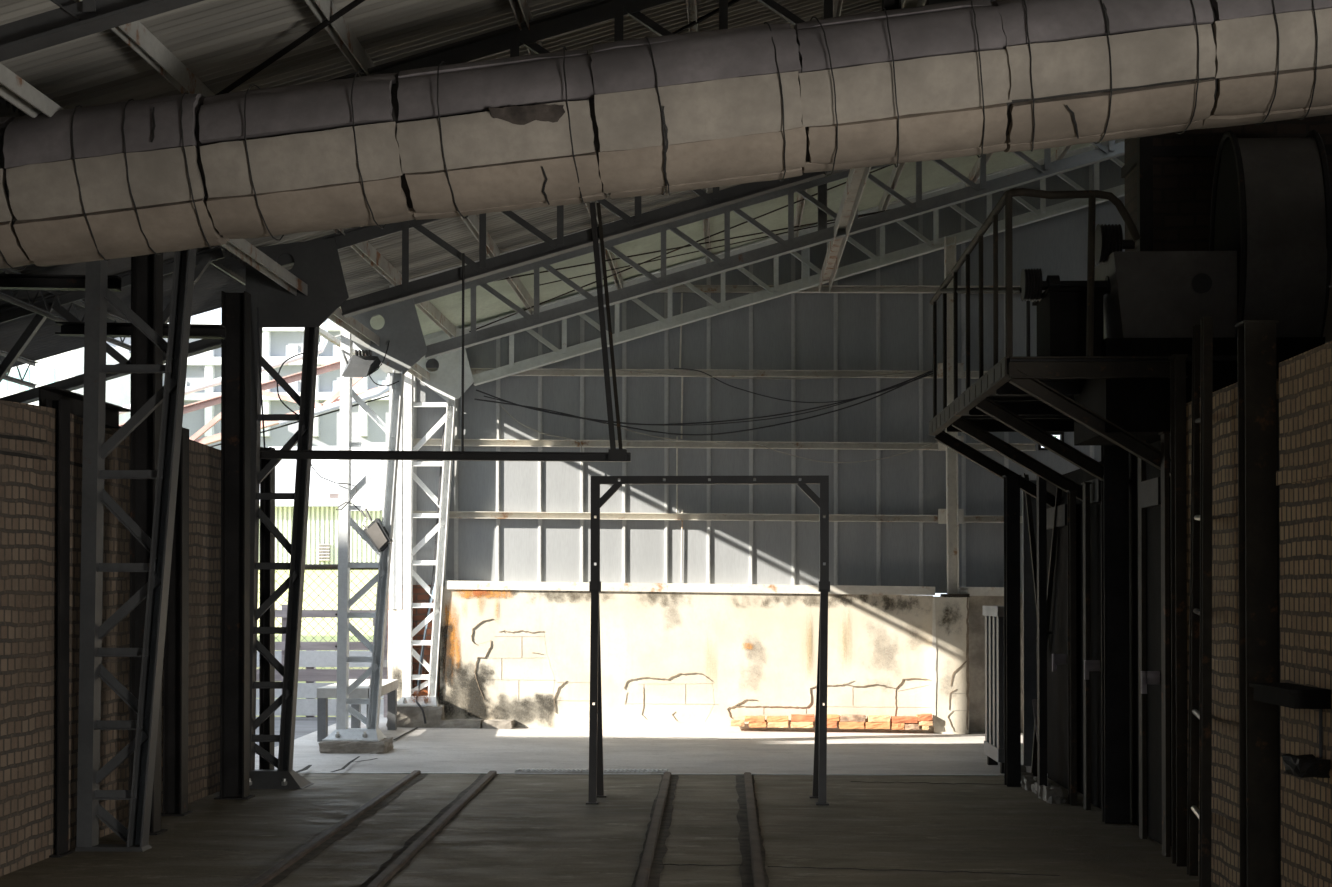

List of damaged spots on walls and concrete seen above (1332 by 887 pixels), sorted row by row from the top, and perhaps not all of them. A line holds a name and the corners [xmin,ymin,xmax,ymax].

corrosion [459,589,512,611]
corrosion [445,606,460,674]
damp [439,625,556,725]